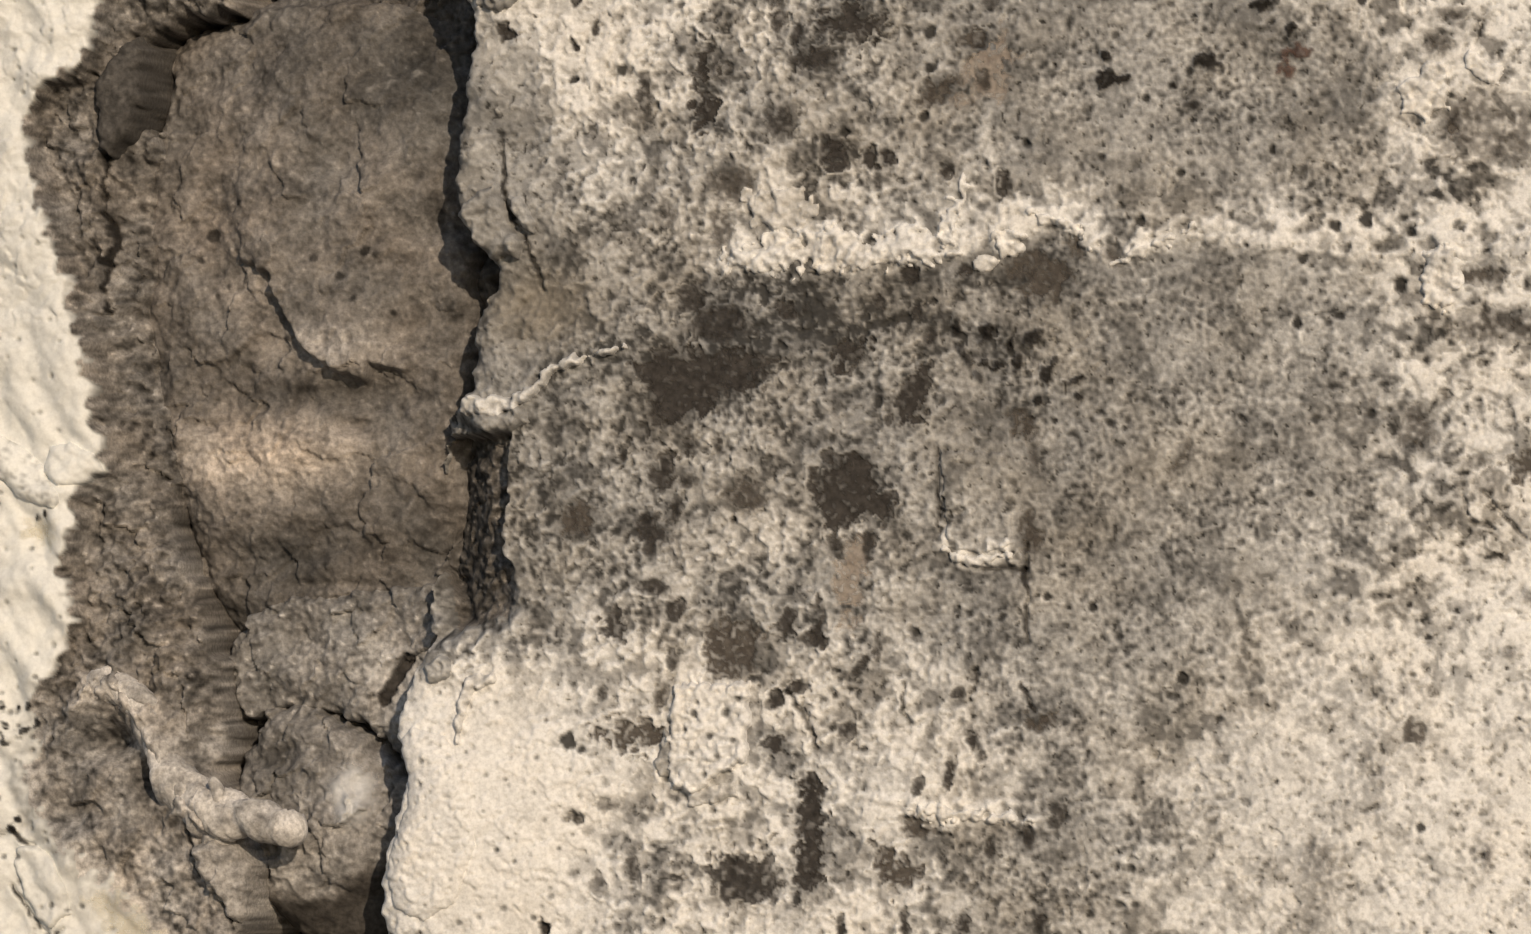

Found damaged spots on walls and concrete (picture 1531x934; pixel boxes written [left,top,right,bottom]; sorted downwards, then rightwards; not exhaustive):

spalling [14,0,301,934]
crack [986,543,1029,635]
peeling [379,653,497,745]